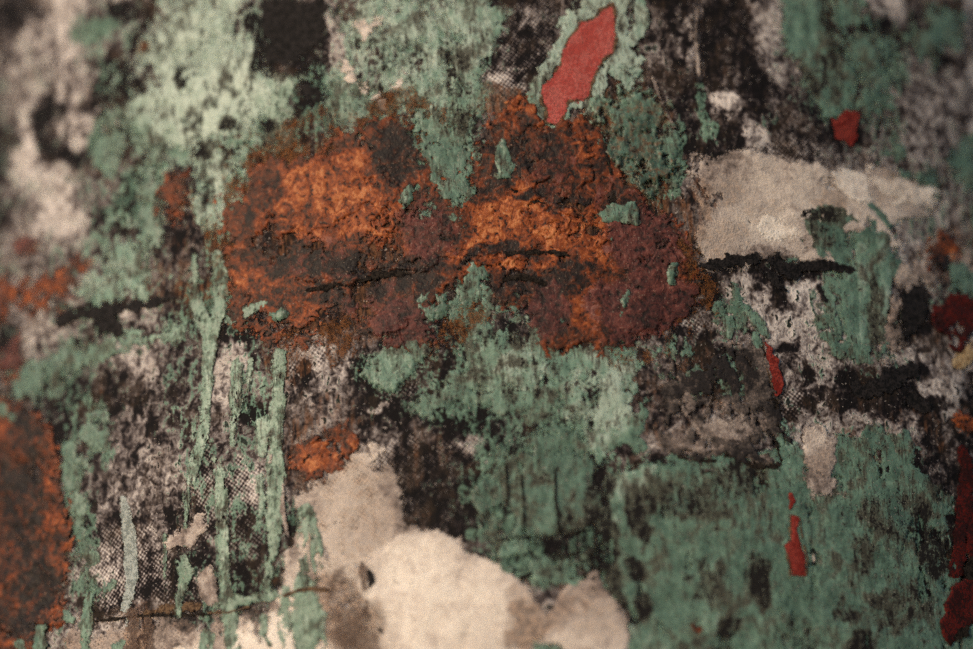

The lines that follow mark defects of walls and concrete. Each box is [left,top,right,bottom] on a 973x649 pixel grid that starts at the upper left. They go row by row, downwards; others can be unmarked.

corrosion [153,169,197,227]
corrosion [202,2,719,370]
peeling [757,0,973,366]
corrosion [6,232,41,260]
corrosion [0,253,94,649]
corrosion [288,419,363,482]
peeling [334,261,973,649]
peeling [197,565,218,606]
peeling [232,611,295,649]